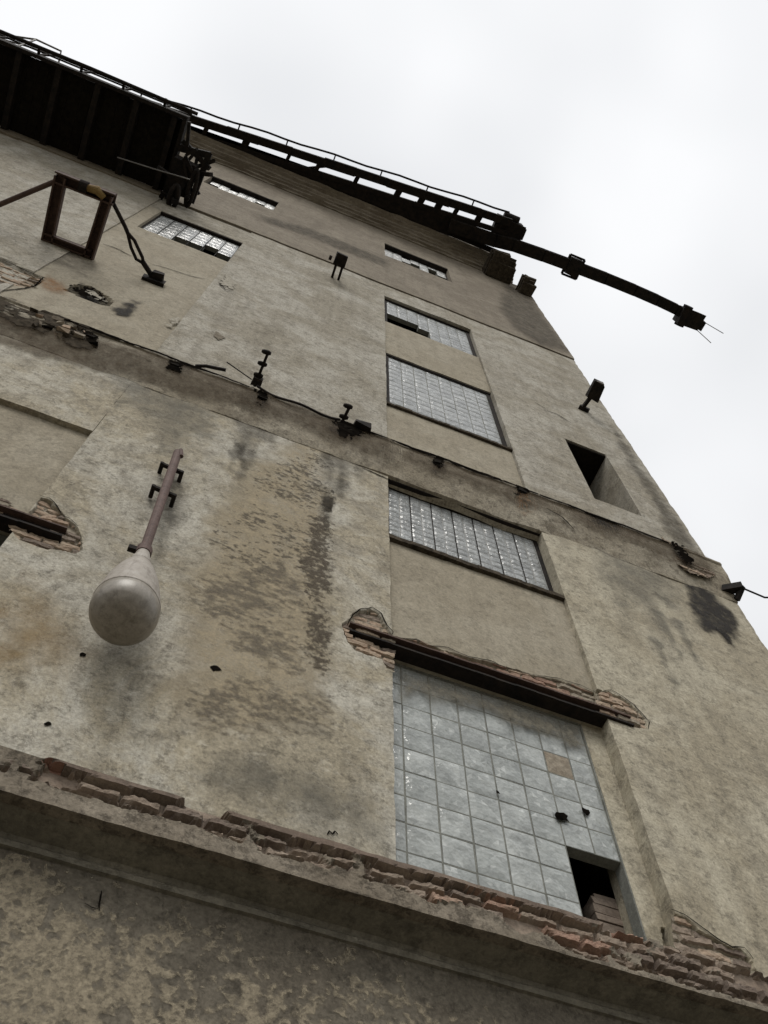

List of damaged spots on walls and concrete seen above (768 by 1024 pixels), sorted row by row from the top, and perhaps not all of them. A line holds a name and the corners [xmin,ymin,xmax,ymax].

flaking render [0,263,42,288]
peeling [30,307,98,349]
flaking render [8,499,81,553]
flaking render [661,537,716,579]
flaking render [413,640,646,729]
flaking render [0,745,768,1024]